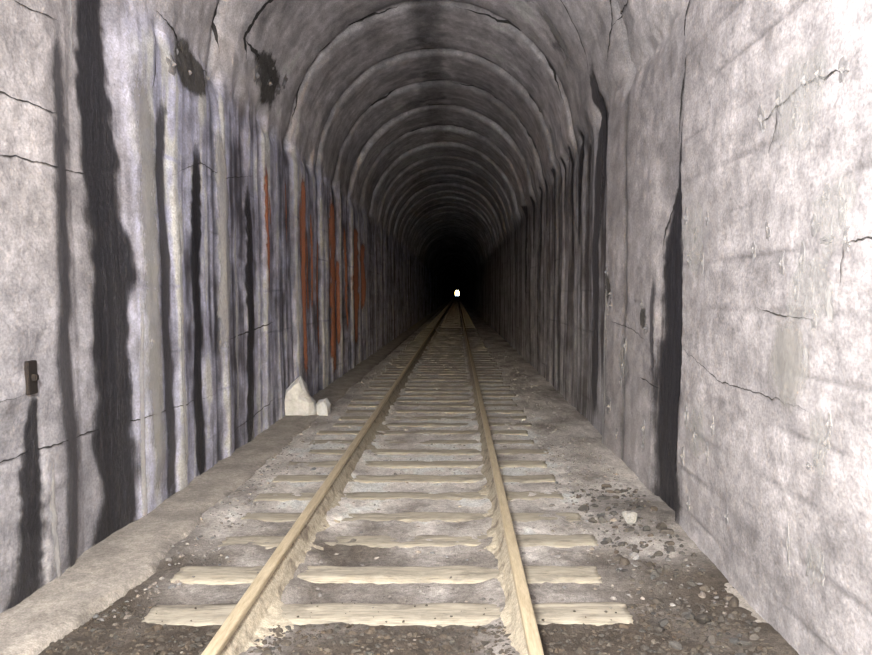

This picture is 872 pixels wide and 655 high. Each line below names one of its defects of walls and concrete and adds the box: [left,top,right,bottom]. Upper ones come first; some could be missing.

crack [152,11,177,88]
spalling [166,38,210,97]
crack [211,2,220,53]
crack [243,0,273,78]
spalling [253,51,288,109]
leakage [6,0,206,610]
leakage [215,133,254,443]
rust [299,180,319,372]
rust [329,204,366,372]
leakage [650,133,683,521]
crack [840,236,872,282]
crack [684,349,809,412]